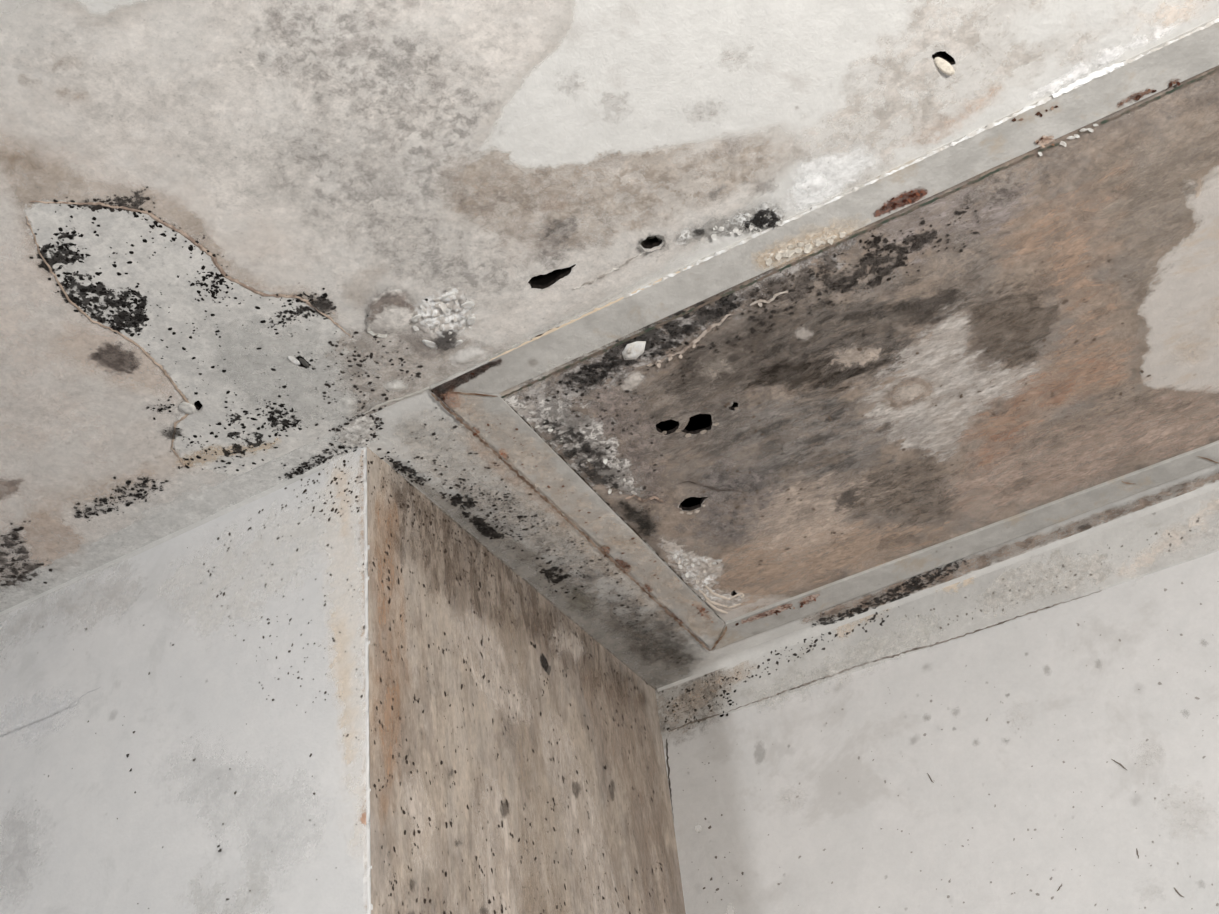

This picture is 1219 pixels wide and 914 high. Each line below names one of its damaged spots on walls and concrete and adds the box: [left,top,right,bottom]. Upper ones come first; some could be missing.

peeling [25,199,385,476]
water stain [0,0,782,340]
hole [530,268,570,285]
water stain [507,65,1219,608]
rust [874,189,927,217]
rust [1117,79,1180,107]
water stain [0,226,1219,914]